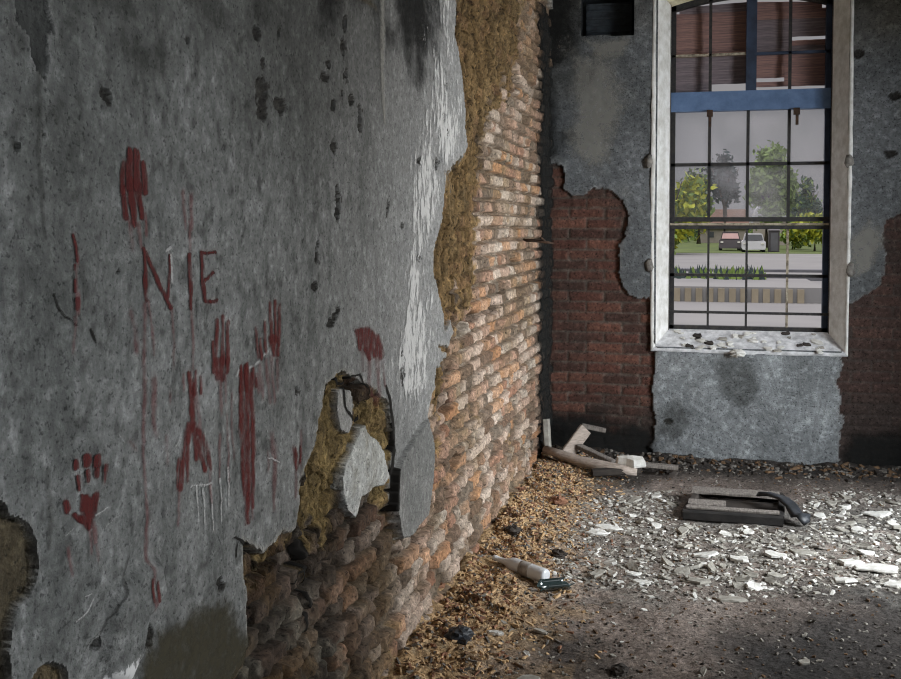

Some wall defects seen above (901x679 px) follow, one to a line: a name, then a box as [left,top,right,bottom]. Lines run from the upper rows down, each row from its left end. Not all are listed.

spalling [233,0,674,679]
spalling [837,214,901,463]
spalling [0,500,39,679]
spalling [32,660,68,679]
peeling [103,658,142,679]
damp [143,603,249,679]